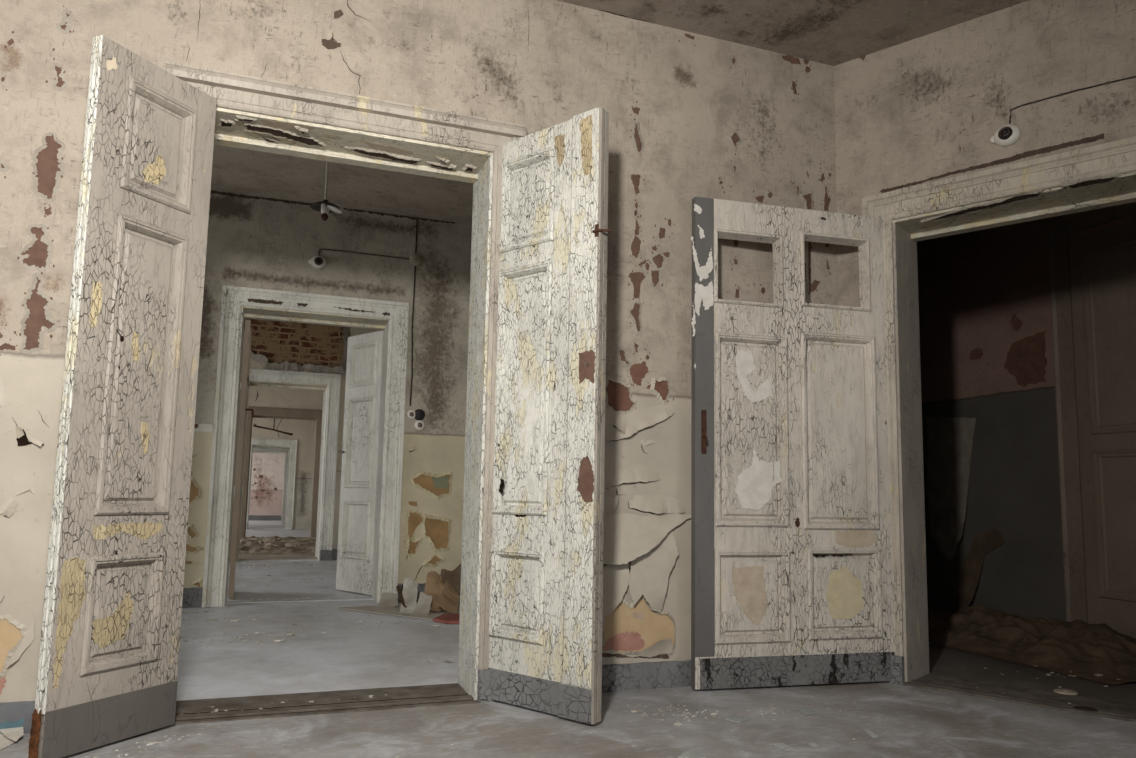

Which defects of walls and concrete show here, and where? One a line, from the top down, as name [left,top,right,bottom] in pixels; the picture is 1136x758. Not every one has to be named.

crack [332,32,361,95]
peeling [630,101,644,157]
water stain [209,196,253,219]
peeling [0,131,66,356]
peeling [605,174,674,414]
peeling [15,425,44,447]
peeling [189,471,203,506]
peeling [404,471,453,568]
peeling [185,524,204,588]
peeling [0,614,35,695]
peeling [602,595,677,659]